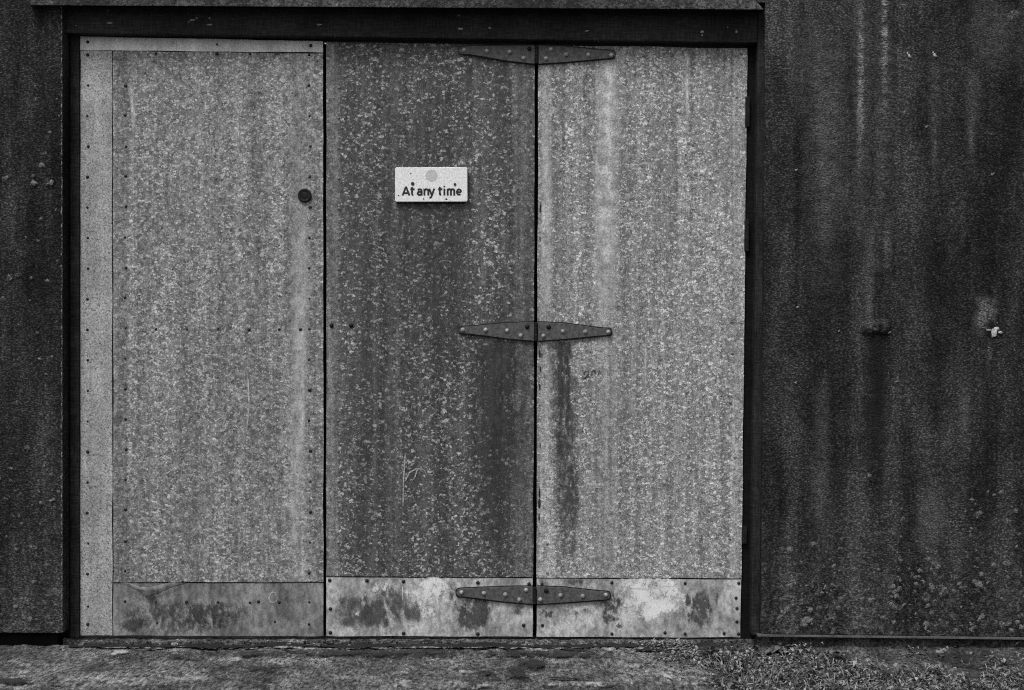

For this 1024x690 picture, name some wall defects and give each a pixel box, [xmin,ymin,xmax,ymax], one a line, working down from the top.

damp [856,0,892,198]
rust [555,343,576,519]